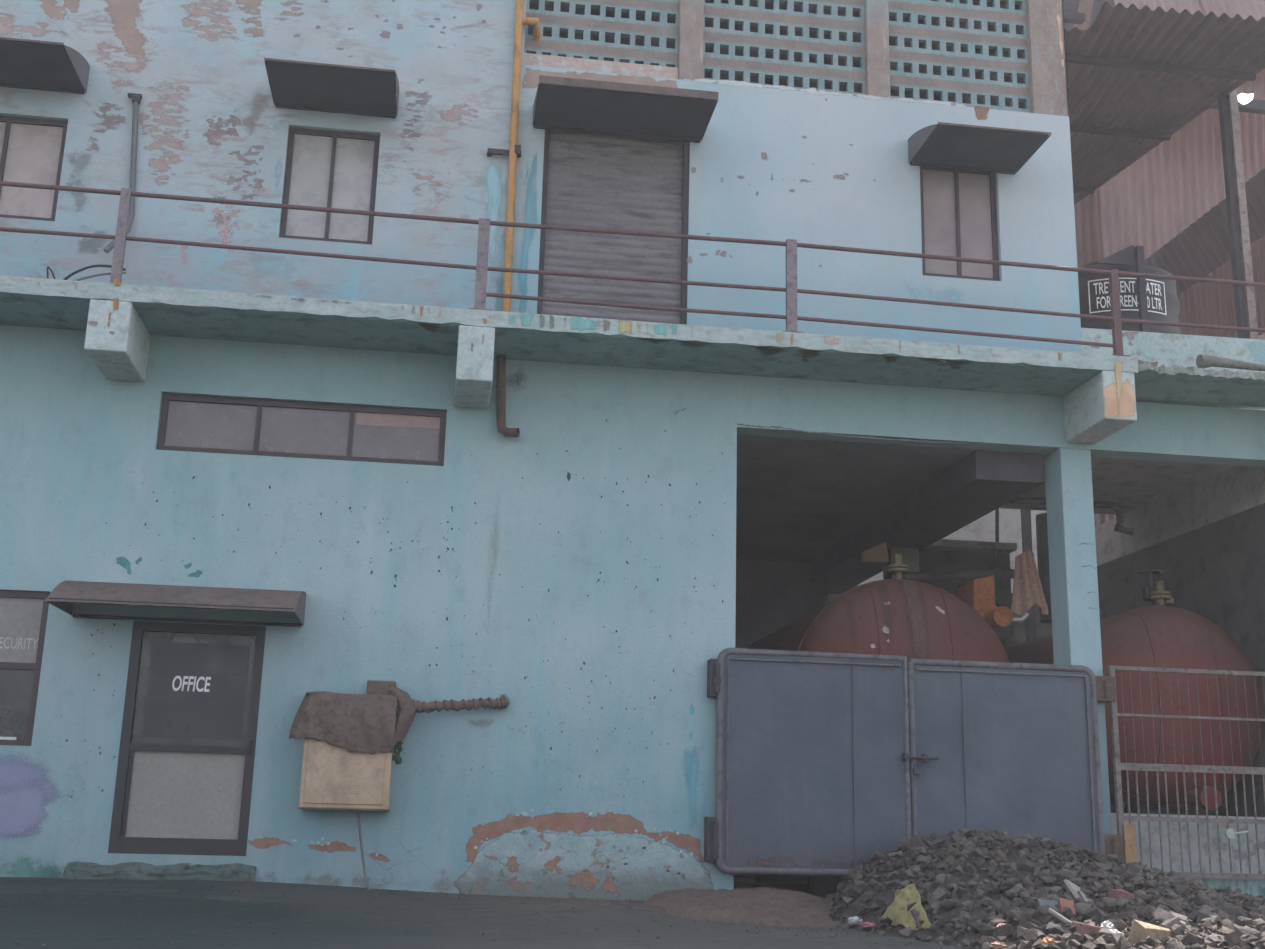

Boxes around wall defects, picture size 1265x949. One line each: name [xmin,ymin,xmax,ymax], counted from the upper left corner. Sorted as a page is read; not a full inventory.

peeling [0,0,80,38]
peeling [179,0,303,44]
peeling [520,68,989,120]
peeling [84,0,265,253]
spalling [1103,381,1136,418]
peeling [248,835,390,862]
peeling [466,809,704,863]